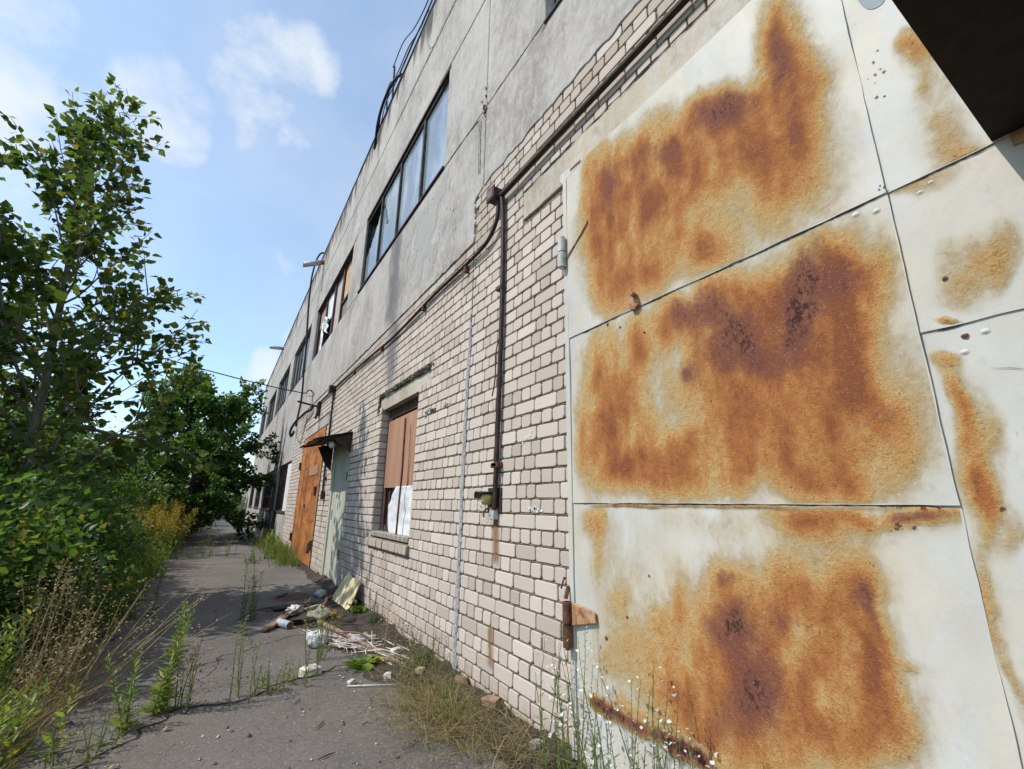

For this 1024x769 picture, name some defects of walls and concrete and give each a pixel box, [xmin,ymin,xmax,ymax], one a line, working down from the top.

rust [574,0,1024,769]